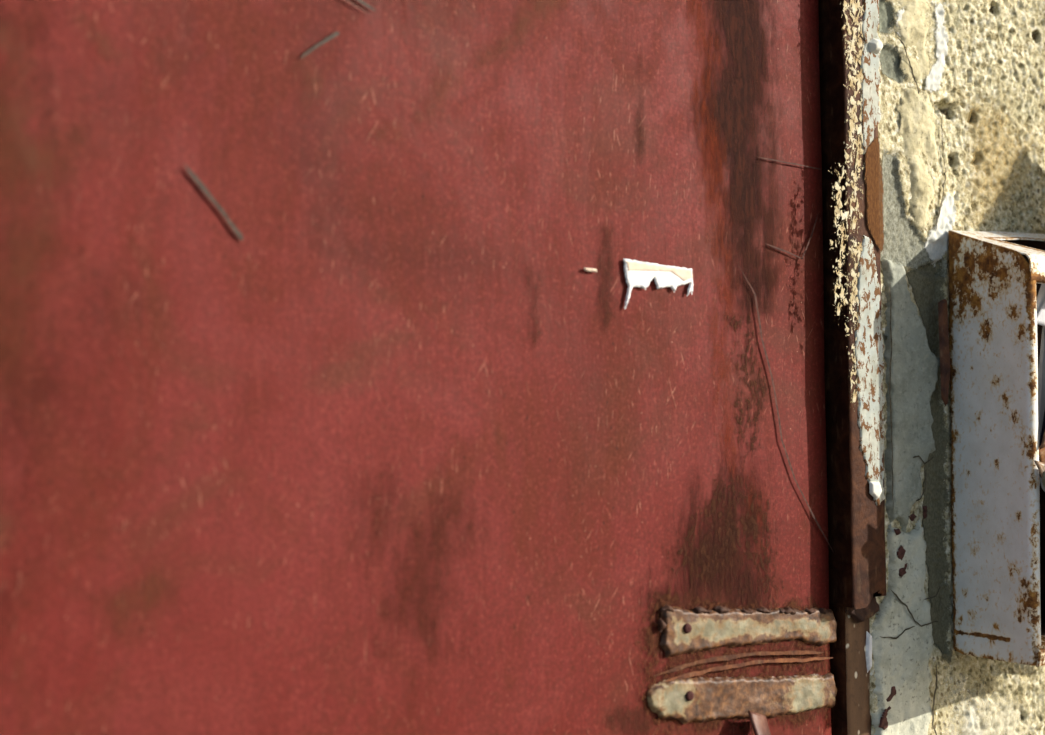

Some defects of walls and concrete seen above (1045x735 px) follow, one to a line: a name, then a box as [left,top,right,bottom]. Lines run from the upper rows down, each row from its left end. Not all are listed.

rust [694,0,774,457]
spalling [828,0,957,664]
rust [637,588,829,735]